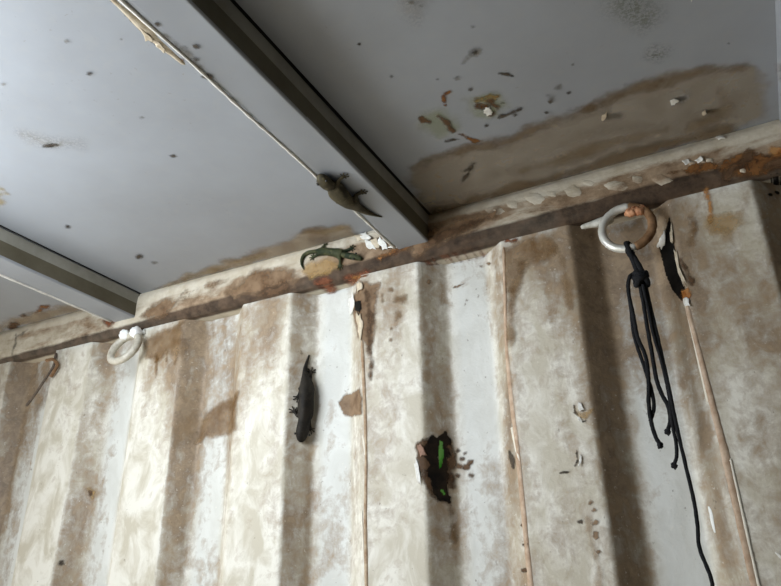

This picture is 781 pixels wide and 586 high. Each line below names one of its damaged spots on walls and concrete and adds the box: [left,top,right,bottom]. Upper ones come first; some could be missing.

peeling [111,0,185,65]
damp [429,125,731,215]
rust [667,147,781,196]
rust [226,260,337,298]
rust [143,299,177,319]
rust [344,270,406,378]
peeling [414,444,427,484]